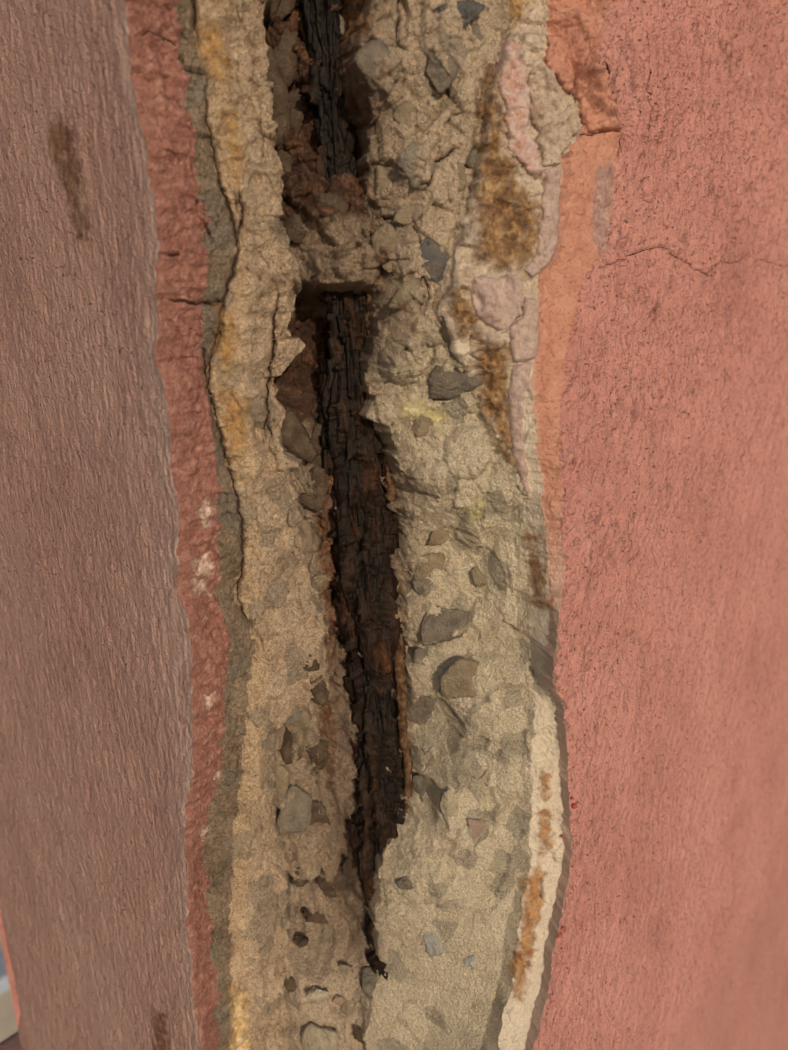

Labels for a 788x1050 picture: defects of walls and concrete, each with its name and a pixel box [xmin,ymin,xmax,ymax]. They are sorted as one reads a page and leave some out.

crack [140,0,199,46]
corrosion [475,64,541,269]
crack [598,247,782,276]
crack [169,87,262,640]
corrosion [450,288,517,469]
corrosion [317,476,337,662]
spalling [124,0,622,1050]
corrosion [393,634,413,814]
corrosion [510,773,553,999]